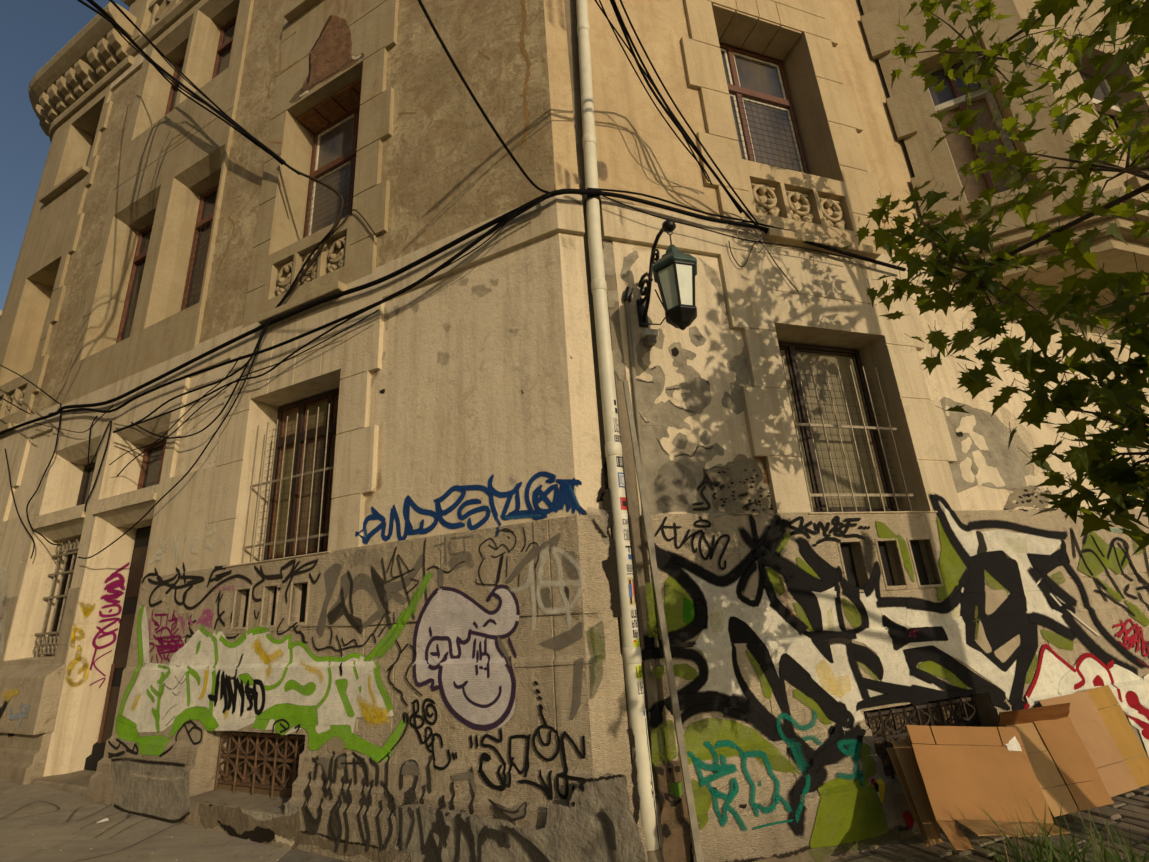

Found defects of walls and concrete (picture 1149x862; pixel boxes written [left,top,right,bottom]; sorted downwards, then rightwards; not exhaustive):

flaking render [290,15,364,133]
peeling [603,243,639,308]
peeling [612,326,773,517]